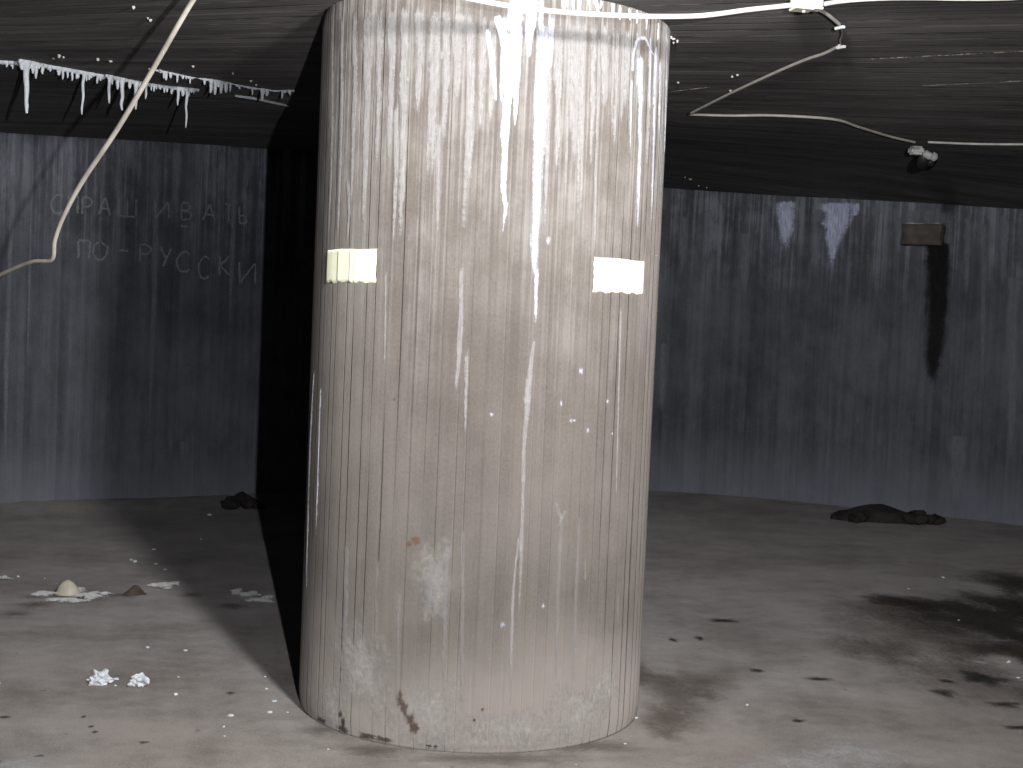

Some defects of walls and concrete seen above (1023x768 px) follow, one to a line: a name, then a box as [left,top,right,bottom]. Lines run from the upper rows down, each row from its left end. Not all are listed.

damp [0,54,209,92]
damp [229,73,295,107]
damp [328,0,706,317]
efflorescence [776,201,795,247]
efflorescence [820,202,860,265]
damp [926,244,948,377]
efflorescence [455,267,468,429]